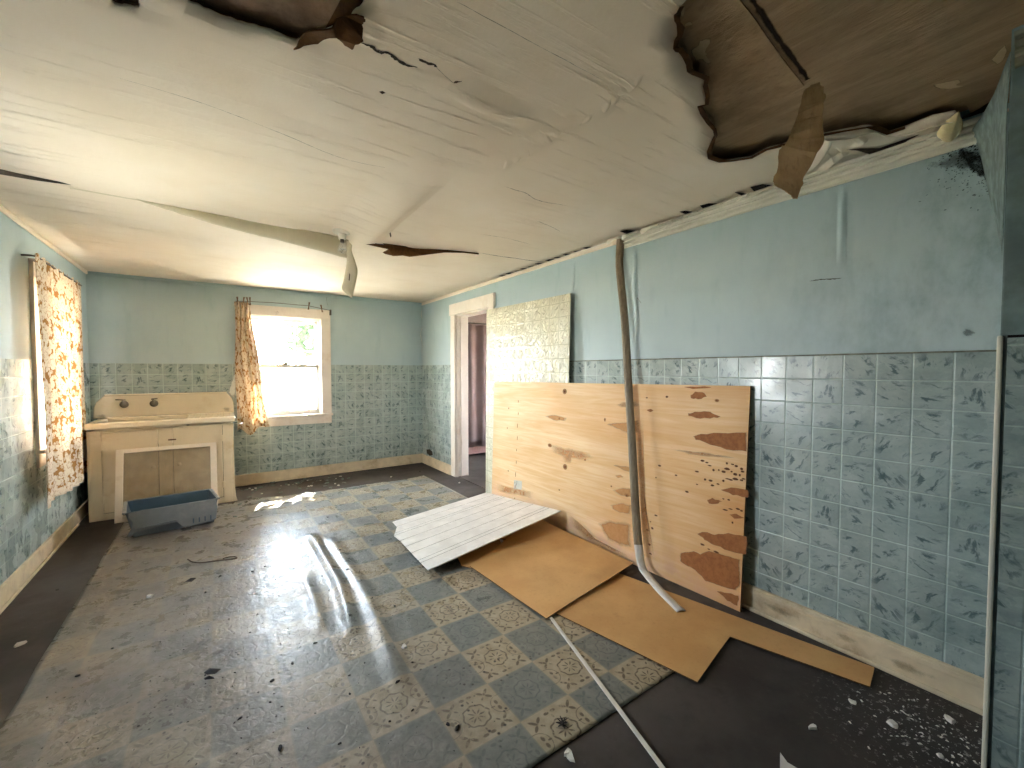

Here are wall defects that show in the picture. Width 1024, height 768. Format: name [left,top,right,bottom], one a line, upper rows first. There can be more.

peeling [196,0,365,50]
crack [362,43,462,83]
peeling [492,0,1024,281]
damp [928,145,988,210]
peeling [0,169,358,298]
peeling [366,232,479,257]